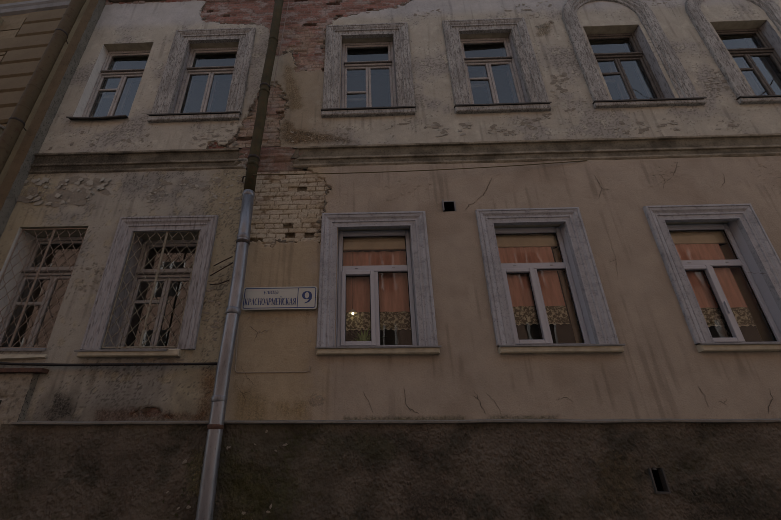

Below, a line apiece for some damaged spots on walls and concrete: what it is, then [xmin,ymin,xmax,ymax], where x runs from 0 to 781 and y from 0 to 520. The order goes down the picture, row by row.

flaking render [190,83,289,149]
flaking render [250,171,330,248]